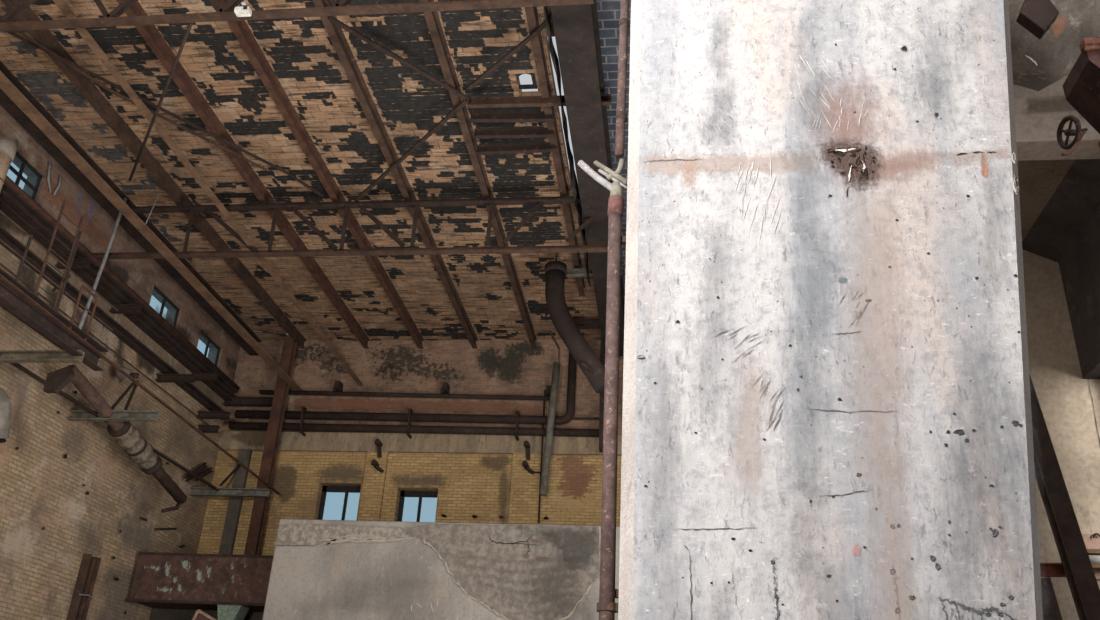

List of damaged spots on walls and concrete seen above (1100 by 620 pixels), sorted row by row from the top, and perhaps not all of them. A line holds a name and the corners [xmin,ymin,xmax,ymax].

peeling [32,0,184,122]
peeling [16,72,88,121]
peeling [88,145,162,195]
peeling [145,0,566,300]
spalling [821,141,880,198]
peeling [224,299,309,336]
peeling [294,291,551,391]
damp [476,341,545,383]
peeling [275,514,600,620]
crack [489,534,539,555]
crack [770,557,781,620]
crack [937,595,1028,620]